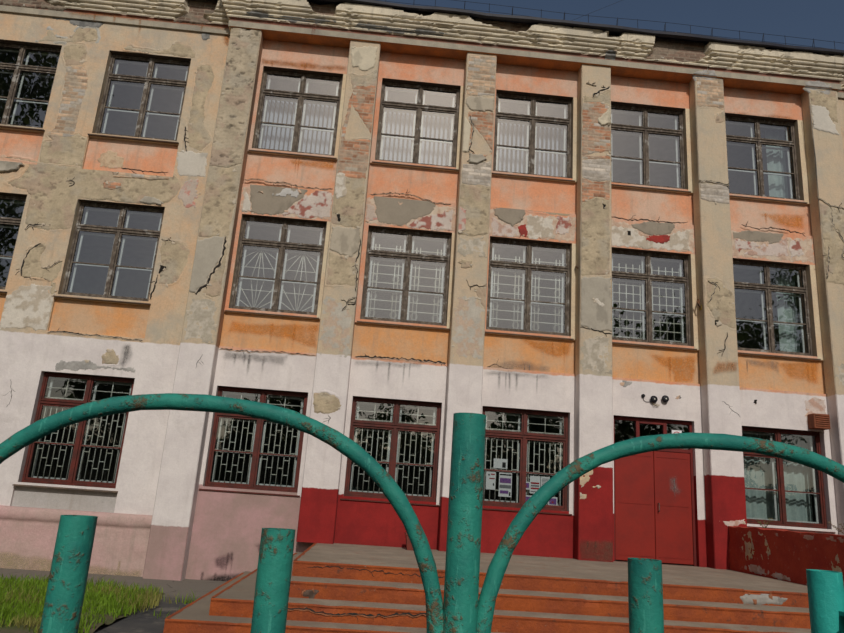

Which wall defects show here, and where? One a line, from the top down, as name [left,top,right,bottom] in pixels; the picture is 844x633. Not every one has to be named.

flaking render [174,0,218,40]
flaking render [472,18,535,32]
flaking render [466,54,496,98]
spalling [0,0,182,232]
spalling [122,27,378,344]
spalling [365,88,695,278]
peeling [731,230,815,264]
spalling [820,203,844,285]
peeling [0,243,62,331]
spalling [313,390,341,414]
peeling [580,470,601,499]
peeling [723,519,791,581]